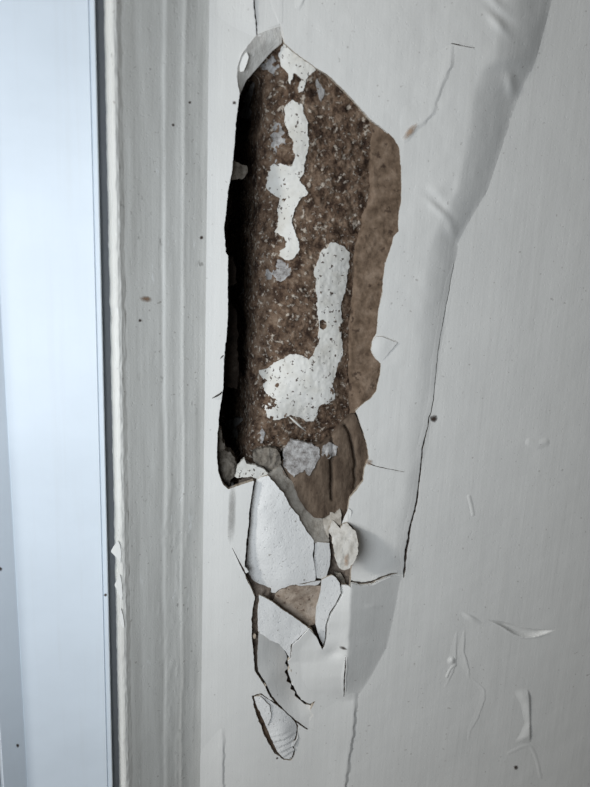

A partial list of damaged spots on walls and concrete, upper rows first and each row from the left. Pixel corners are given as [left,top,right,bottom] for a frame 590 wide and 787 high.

crack [217,0,261,37]
spalling [213,27,401,759]
crack [350,262,458,587]
crack [308,657,358,787]